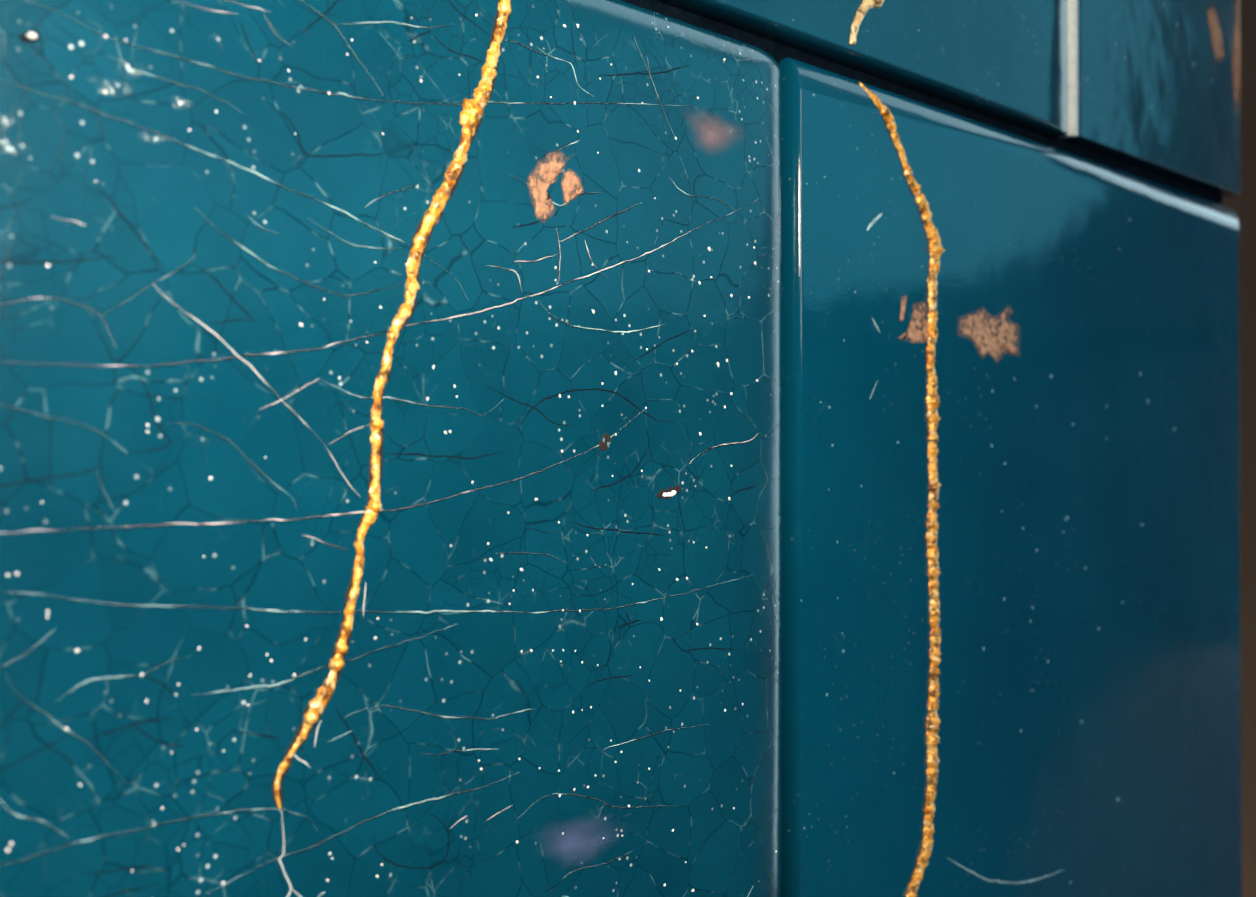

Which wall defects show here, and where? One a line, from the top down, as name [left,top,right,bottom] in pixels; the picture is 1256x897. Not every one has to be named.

crack [849,0,884,46]
peeling [529,154,582,219]
peeling [960,309,1017,360]
crack [0,0,760,897]
crack [859,81,1064,897]